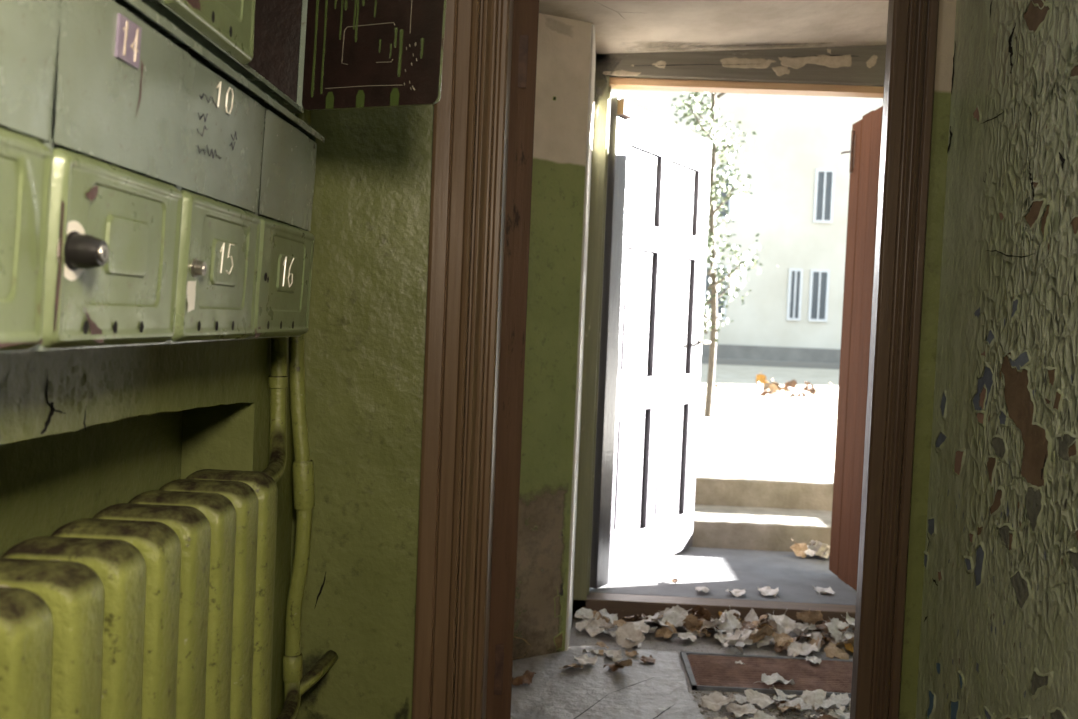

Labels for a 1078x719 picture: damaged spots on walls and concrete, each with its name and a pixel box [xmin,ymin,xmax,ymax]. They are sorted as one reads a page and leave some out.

peeling [1022,0,1052,42]
peeling [720,49,852,76]
peeling [1015,180,1078,251]
peeling [948,297,1078,612]
peeling [513,488,567,660]
peeling [926,658,993,719]